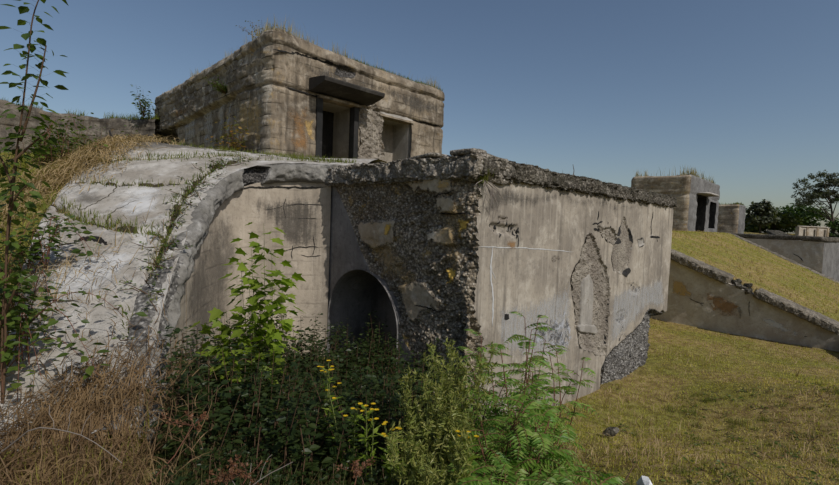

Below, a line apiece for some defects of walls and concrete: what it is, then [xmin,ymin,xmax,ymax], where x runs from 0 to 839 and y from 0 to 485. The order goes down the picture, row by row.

crack [242,186,321,258]
spalling [335,178,487,408]
spalling [489,216,519,246]
peeling [530,217,665,385]